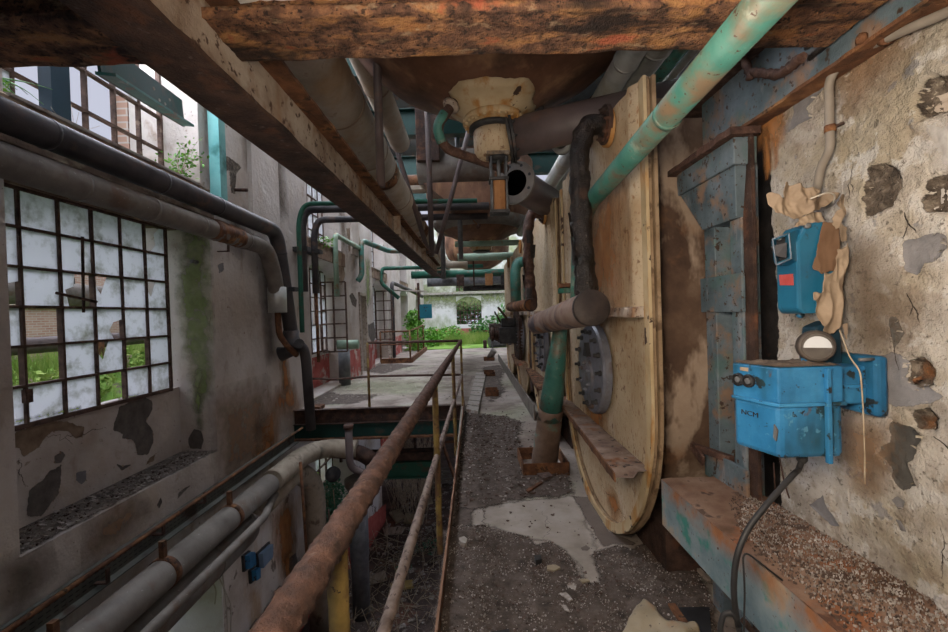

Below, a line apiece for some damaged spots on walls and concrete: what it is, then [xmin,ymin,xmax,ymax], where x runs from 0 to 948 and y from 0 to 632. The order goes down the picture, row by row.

spalling [861,163,903,217]
flaking render [902,230,947,275]
flaking render [15,398,216,553]
flaking render [880,317,943,532]